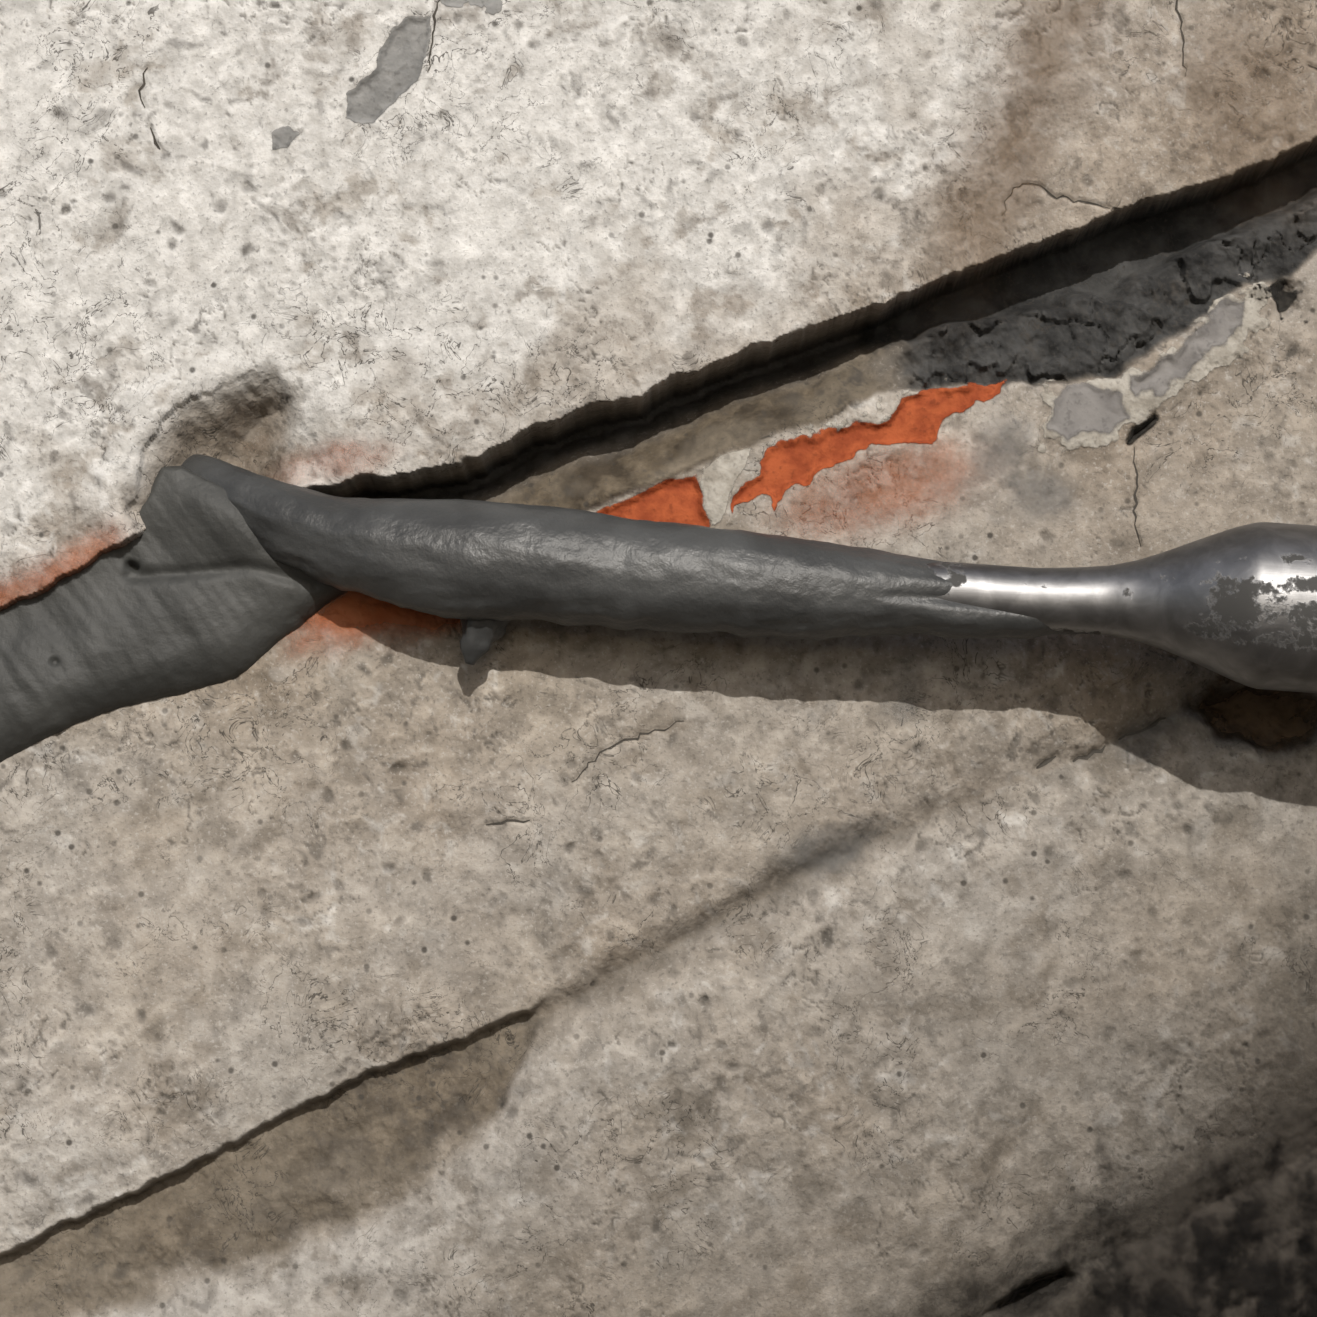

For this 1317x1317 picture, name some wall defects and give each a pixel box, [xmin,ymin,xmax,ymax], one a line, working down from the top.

peeling [441,0,502,15]
peeling [346,16,431,124]
peeling [272,126,300,149]
crack [1002,183,1110,215]
spalling [1036,273,1302,453]
spalling [597,379,1007,527]
crack [1133,447,1141,546]
water stain [1081,1032,1317,1317]